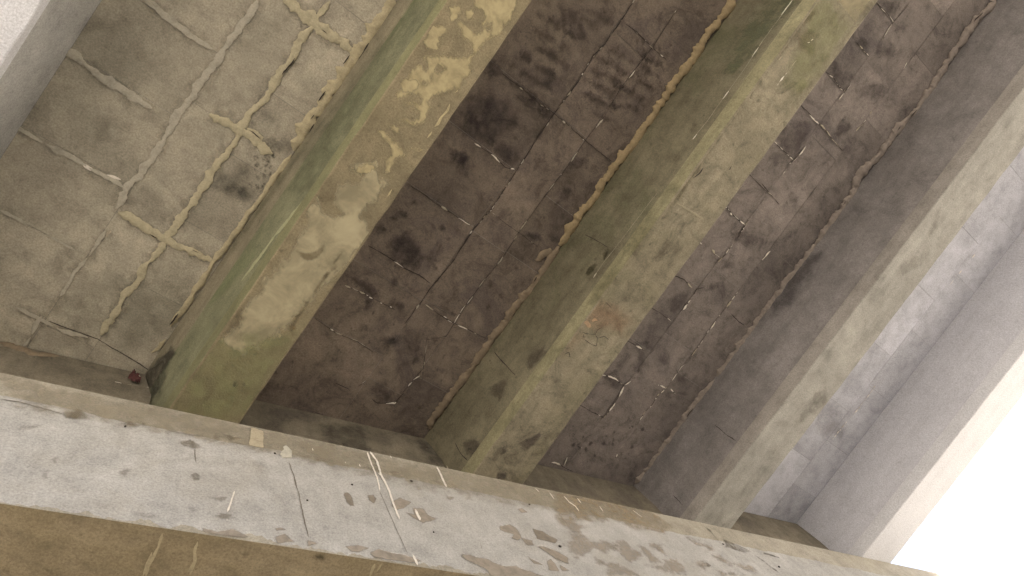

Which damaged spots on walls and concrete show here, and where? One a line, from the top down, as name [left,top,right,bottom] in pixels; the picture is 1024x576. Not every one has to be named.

peeling [357,0,516,173]
crack [49,321,148,370]
damp [224,161,387,354]
crack [336,0,676,404]
crack [566,292,744,421]
crack [652,276,701,321]
crack [700,207,750,262]
crack [729,106,872,204]
peeling [462,520,681,576]